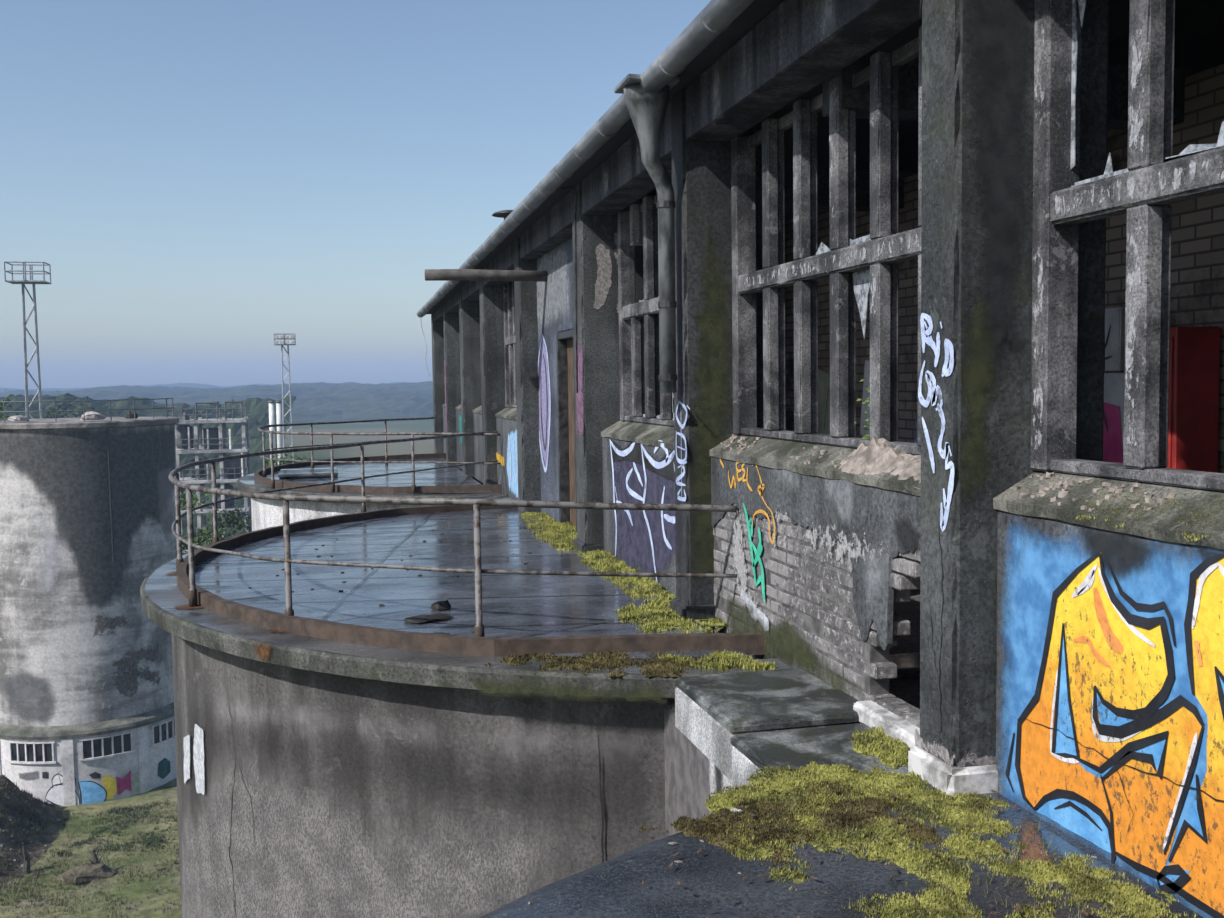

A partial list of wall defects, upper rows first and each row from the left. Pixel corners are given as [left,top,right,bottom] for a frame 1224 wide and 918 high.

leakage [0,427,175,607]
peeling [730,510,769,631]
peeling [762,509,888,577]
leakage [5,676,52,721]
crack [597,737,605,863]